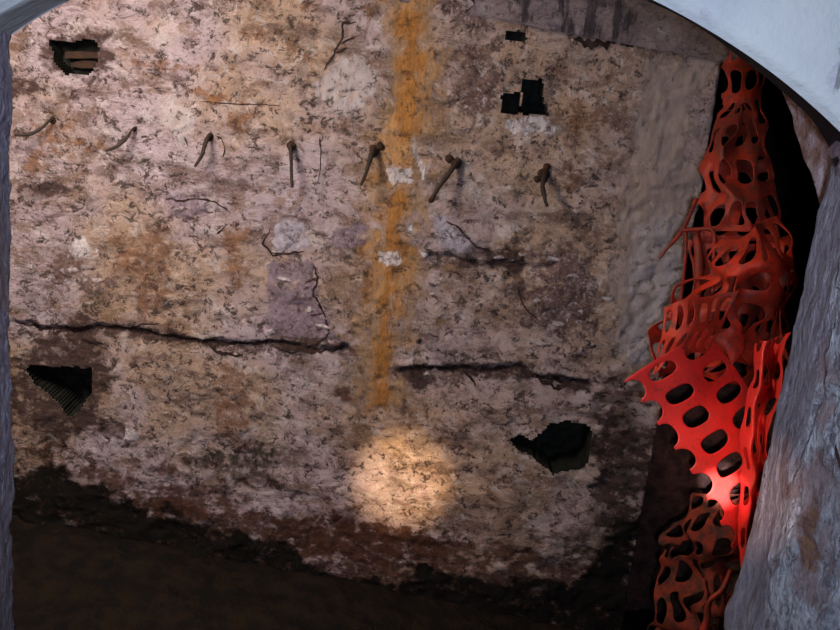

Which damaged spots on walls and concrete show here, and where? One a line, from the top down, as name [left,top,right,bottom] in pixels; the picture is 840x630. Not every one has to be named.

hole [49,39,100,76]
spalling [442,29,528,144]
corrosion [357,0,437,409]
peeling [429,48,715,376]
hole [24,365,92,417]
crack [407,362,594,393]
hole [510,420,592,476]